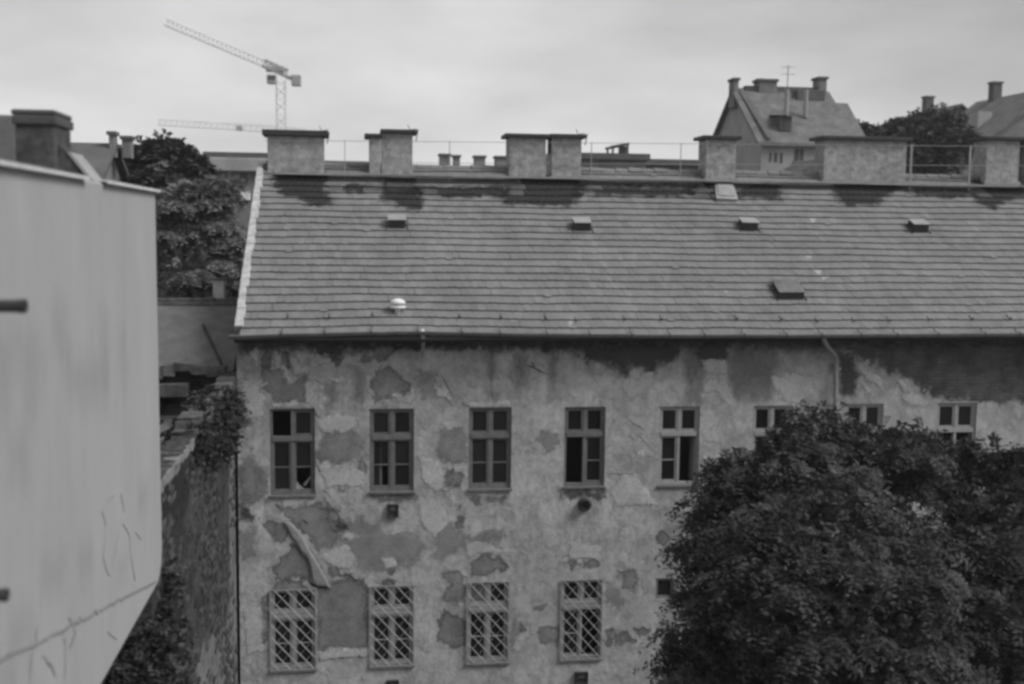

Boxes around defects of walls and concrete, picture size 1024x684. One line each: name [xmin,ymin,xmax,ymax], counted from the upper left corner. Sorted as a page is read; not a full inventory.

water stain [334,341,1024,396]
flaking render [701,359,734,410]
flaking render [770,372,814,405]
flaking render [536,430,560,452]
flaking render [560,471,659,508]
flaking render [194,342,511,684]
flaking render [567,540,603,571]
flaking render [605,568,638,607]
flaking render [509,618,560,650]
flaking render [605,627,651,647]